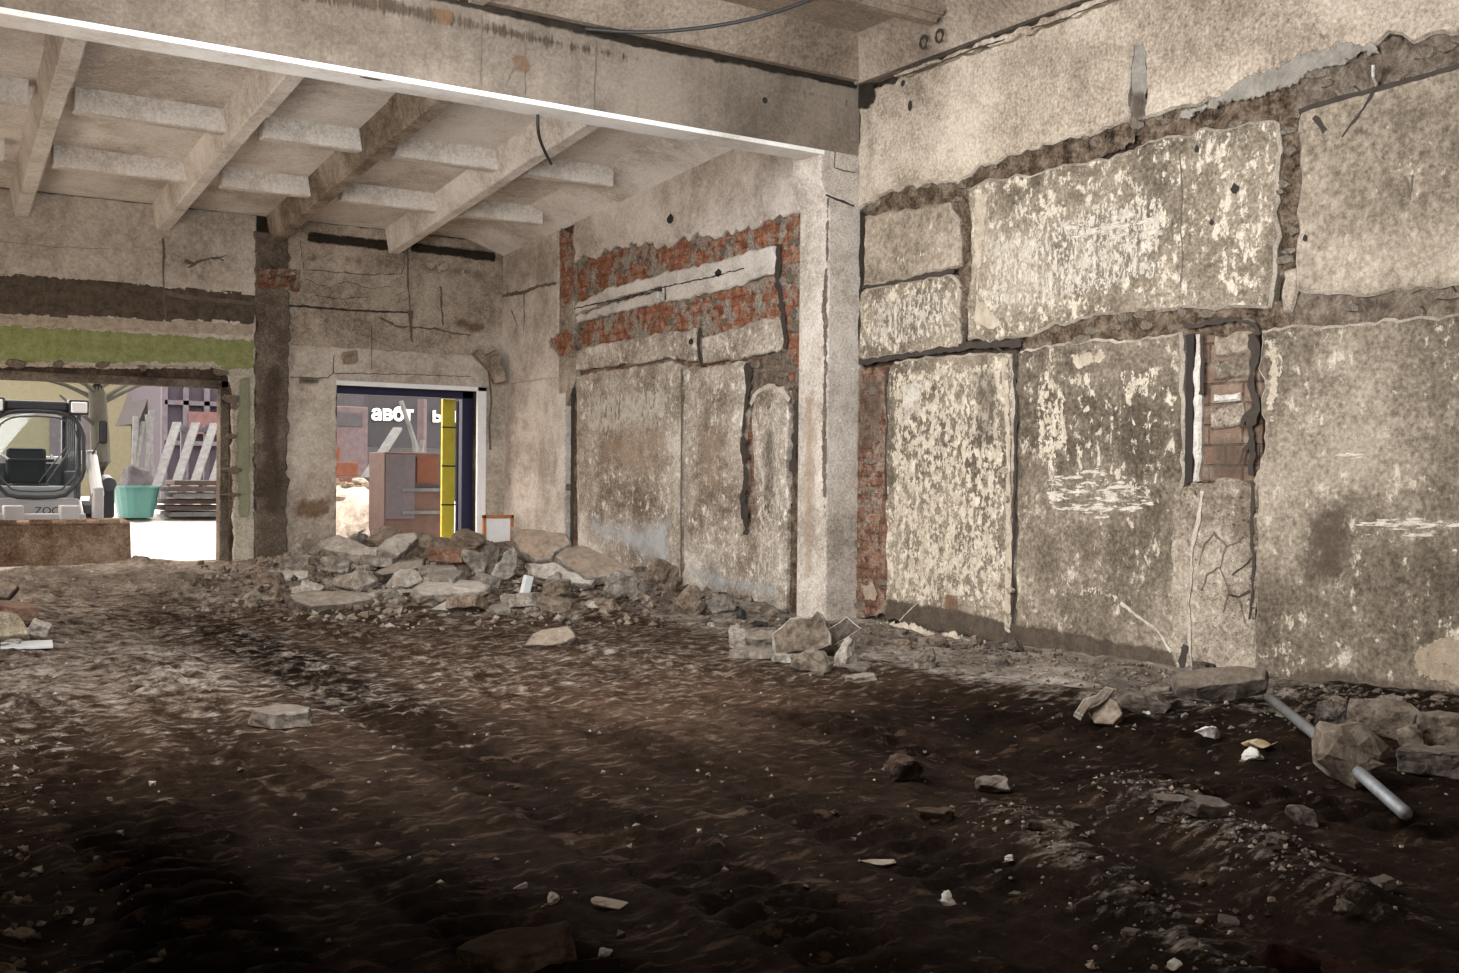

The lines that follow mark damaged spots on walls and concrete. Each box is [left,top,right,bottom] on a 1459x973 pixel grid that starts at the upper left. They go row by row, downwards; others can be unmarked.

spalling [858,34,1459,348]
crack [1177,153,1185,288]
peeling [0,266,300,517]
flaking render [549,214,800,597]
peeling [854,286,1459,633]
crack [1120,316,1261,668]
flaking render [1413,636,1459,687]